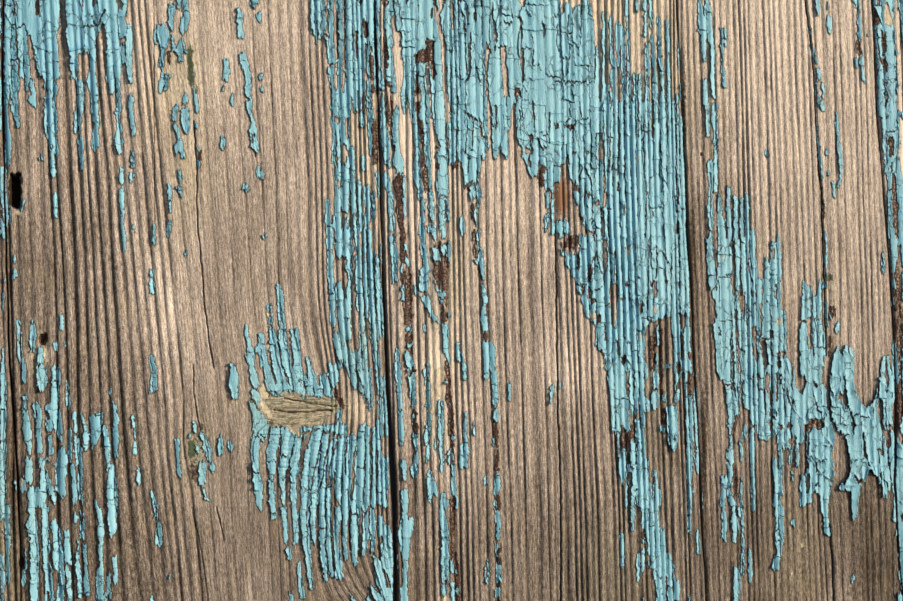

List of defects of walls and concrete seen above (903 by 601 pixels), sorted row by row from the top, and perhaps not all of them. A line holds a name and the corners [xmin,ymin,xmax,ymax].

peeling [0,314,120,601]
peeling [0,0,136,252]
peeling [150,489,163,548]
peeling [153,0,189,94]
peeling [172,69,199,159]
crack [193,122,213,423]
peeling [174,421,233,501]
peeling [229,363,239,400]
peeling [222,51,264,153]
peeling [244,0,703,601]
peeling [697,0,903,601]
crack [805,0,826,349]